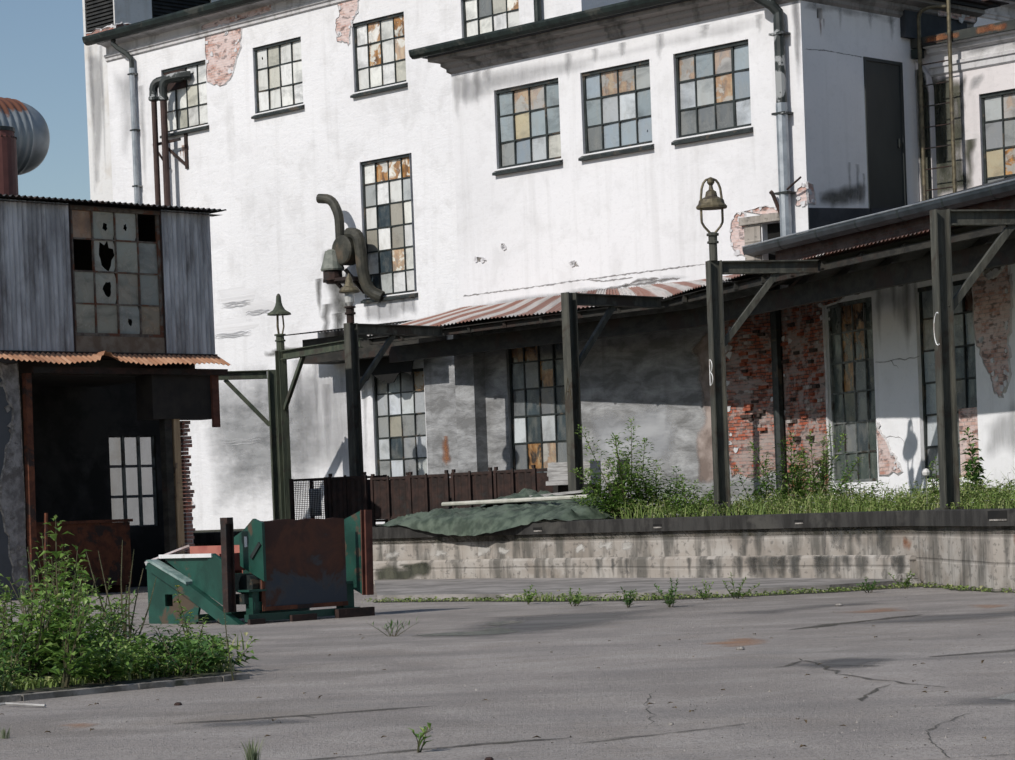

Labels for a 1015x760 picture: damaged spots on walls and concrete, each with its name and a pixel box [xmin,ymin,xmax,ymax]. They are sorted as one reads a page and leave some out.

peeling [202,5,271,87]
peeling [335,0,360,46]
damp [916,69,945,174]
damp [956,92,974,175]
peeling [729,205,778,257]
peeling [972,265,1014,398]
flaking render [724,297,845,498]
peeling [0,362,29,590]
peeling [876,422,903,477]